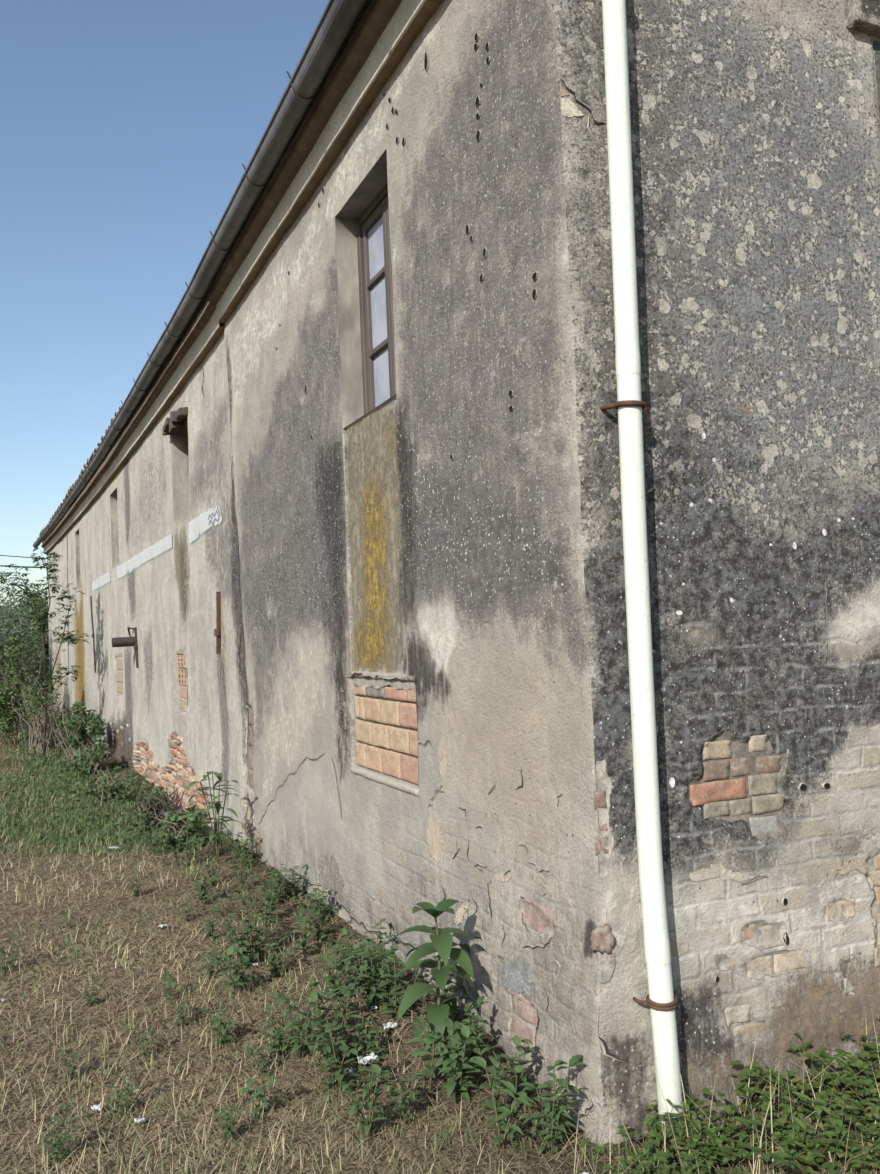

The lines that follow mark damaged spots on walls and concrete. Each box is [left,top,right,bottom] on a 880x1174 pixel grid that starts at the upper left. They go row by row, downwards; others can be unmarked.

crack [560,78,606,138]
water stain [396,401,416,624]
water stain [316,434,355,777]
water stain [403,638,450,719]
flaking render [669,727,788,841]
flaking render [689,864,755,883]
flaking render [825,898,856,923]
flaking render [838,852,880,967]